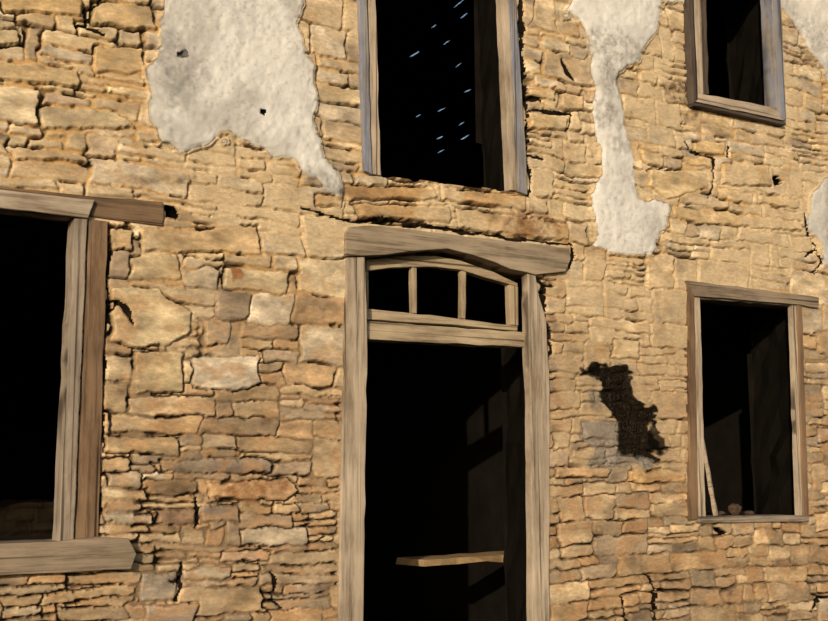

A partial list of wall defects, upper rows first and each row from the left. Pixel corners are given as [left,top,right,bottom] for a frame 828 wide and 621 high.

spalling [517,0,828,268]
crack [684,141,729,198]
crack [804,213,823,275]
crack [103,224,134,389]
crack [99,414,107,440]
water stain [578,419,653,469]
crack [97,469,105,518]
crack [169,562,183,602]
crack [268,571,282,608]